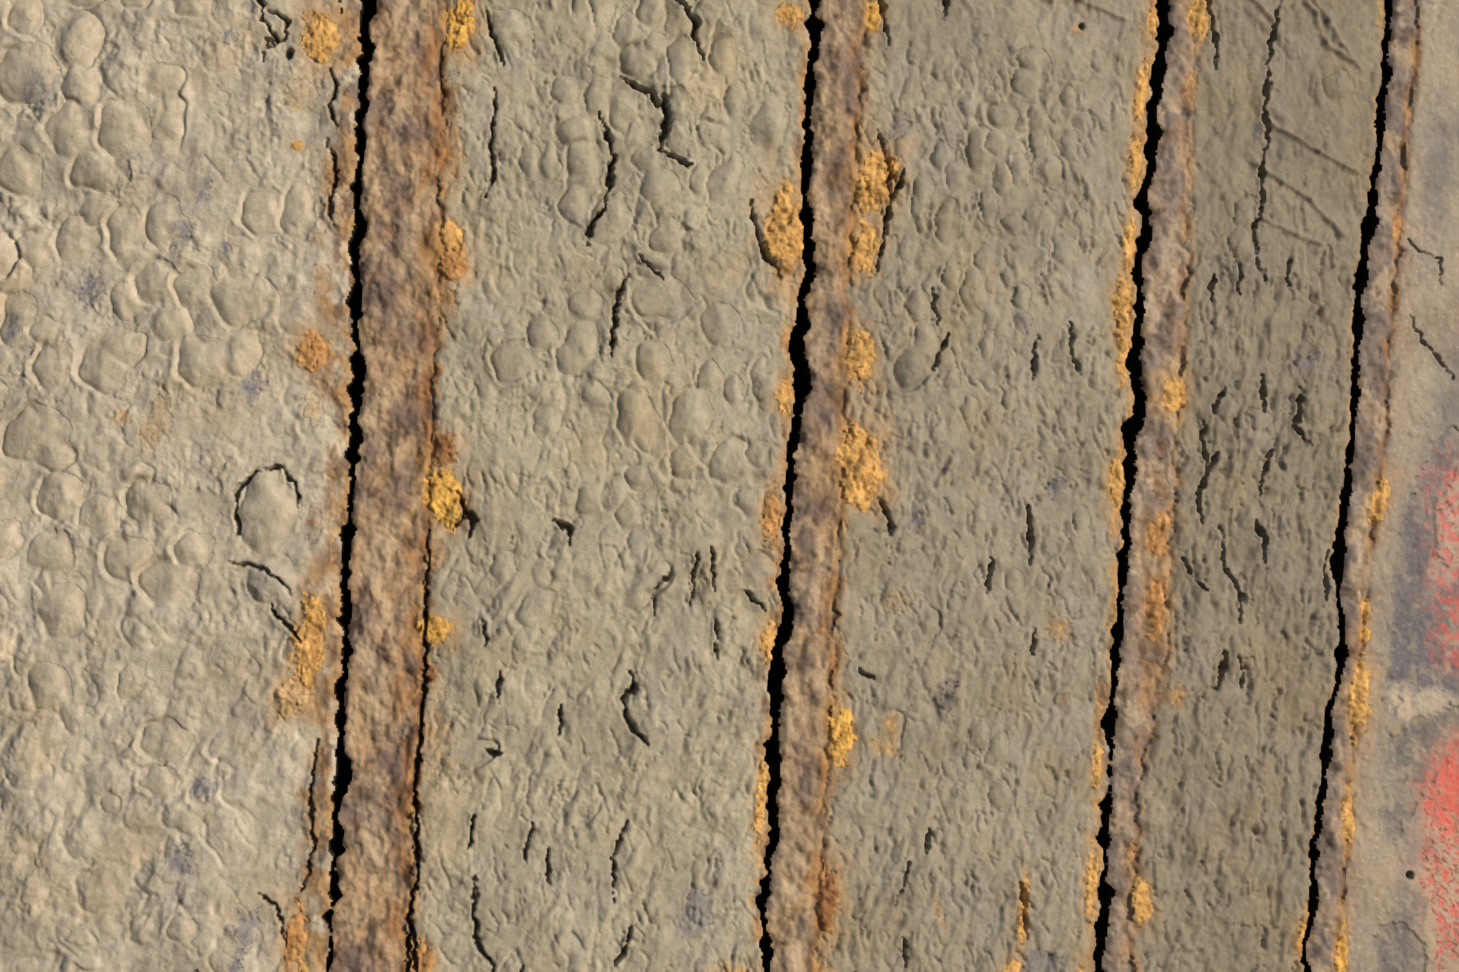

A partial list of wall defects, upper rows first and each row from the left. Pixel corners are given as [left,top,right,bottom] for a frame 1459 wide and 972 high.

crack [619,75,693,168]
corrosion [763,177,806,287]
corrosion [848,150,901,278]
corrosion [1111,218,1136,388]
crack [227,464,302,644]
crack [255,0,377,972]
corrosion [424,434,467,571]
crack [651,0,825,972]
crack [1093,0,1220,972]
crack [1181,0,1444,972]
corrosion [416,616,459,791]
corrosion [753,760,770,851]